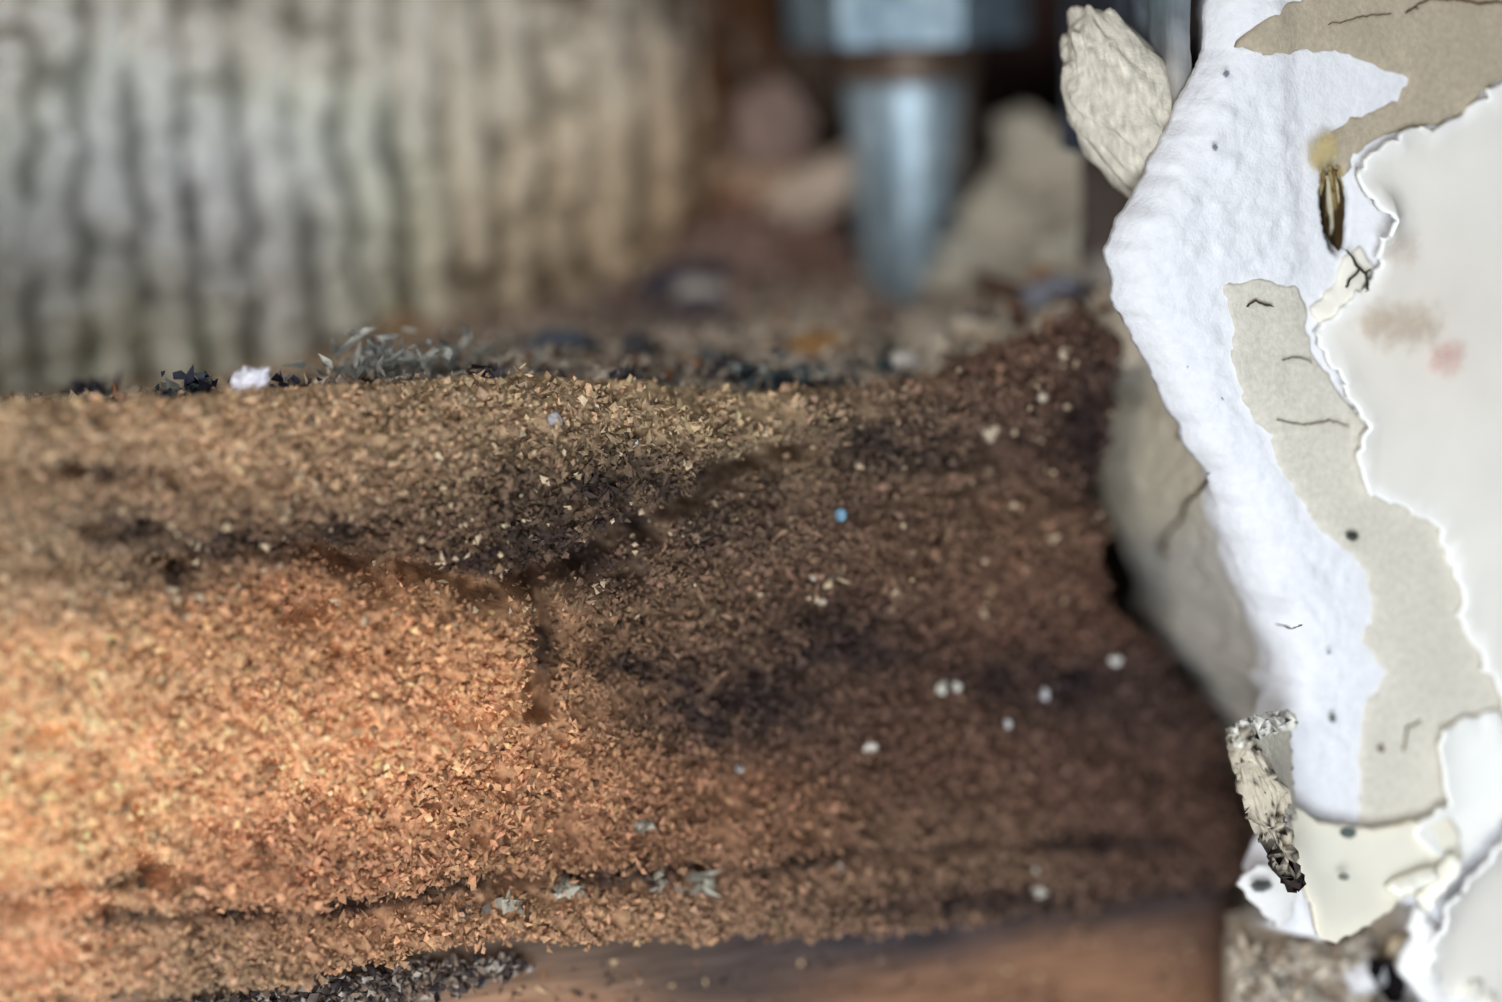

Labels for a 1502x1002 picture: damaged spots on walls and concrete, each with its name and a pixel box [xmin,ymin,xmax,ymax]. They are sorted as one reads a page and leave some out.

peeling [1223,0,1502,1002]